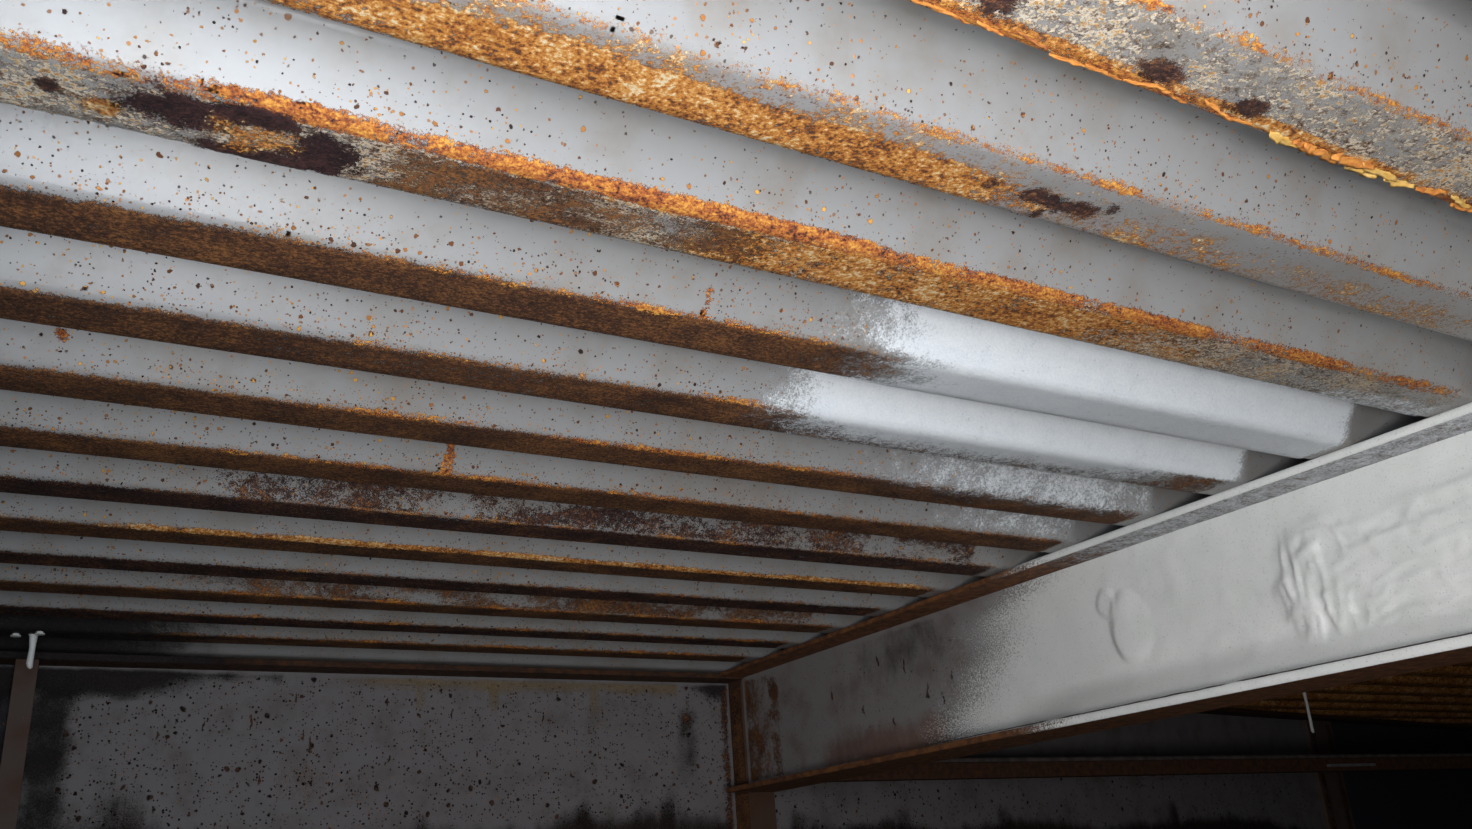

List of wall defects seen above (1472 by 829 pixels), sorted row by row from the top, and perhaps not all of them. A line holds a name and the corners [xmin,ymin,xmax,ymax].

rust [0,0,1472,662]
water stain [553,802,731,829]
rust [16,617,1313,829]